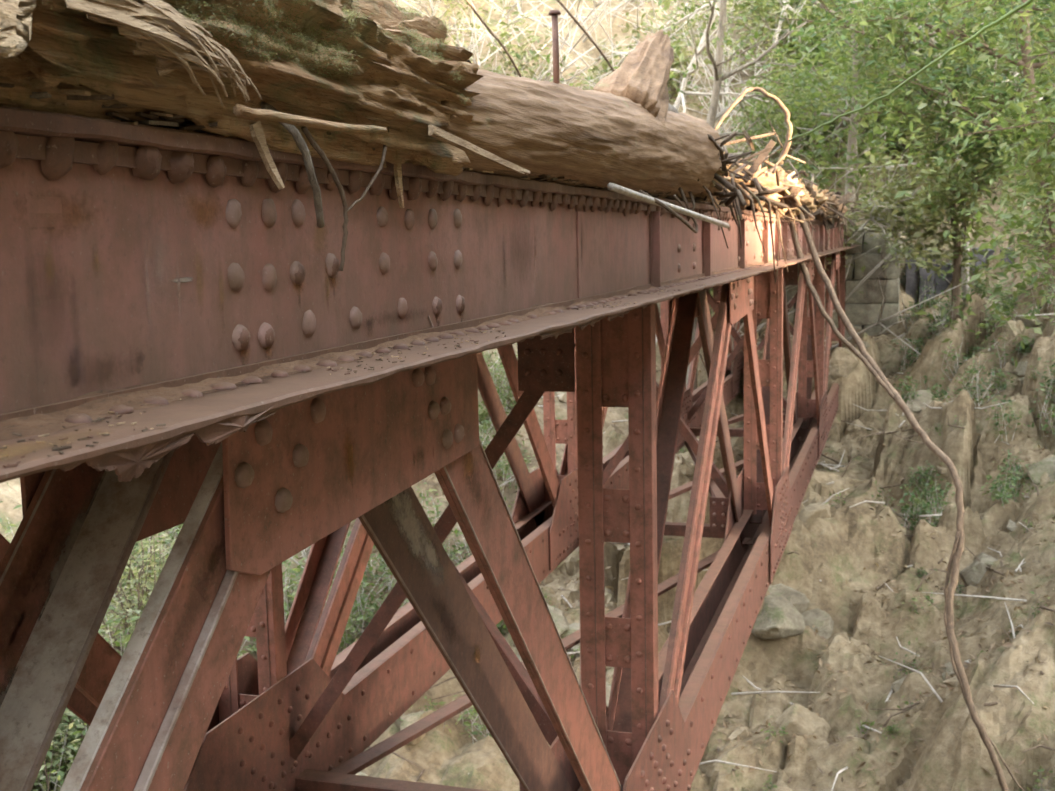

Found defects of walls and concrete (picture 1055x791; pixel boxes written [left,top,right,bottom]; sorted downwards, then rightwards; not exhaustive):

rust [539,304,649,340]
rust [38,407,277,482]